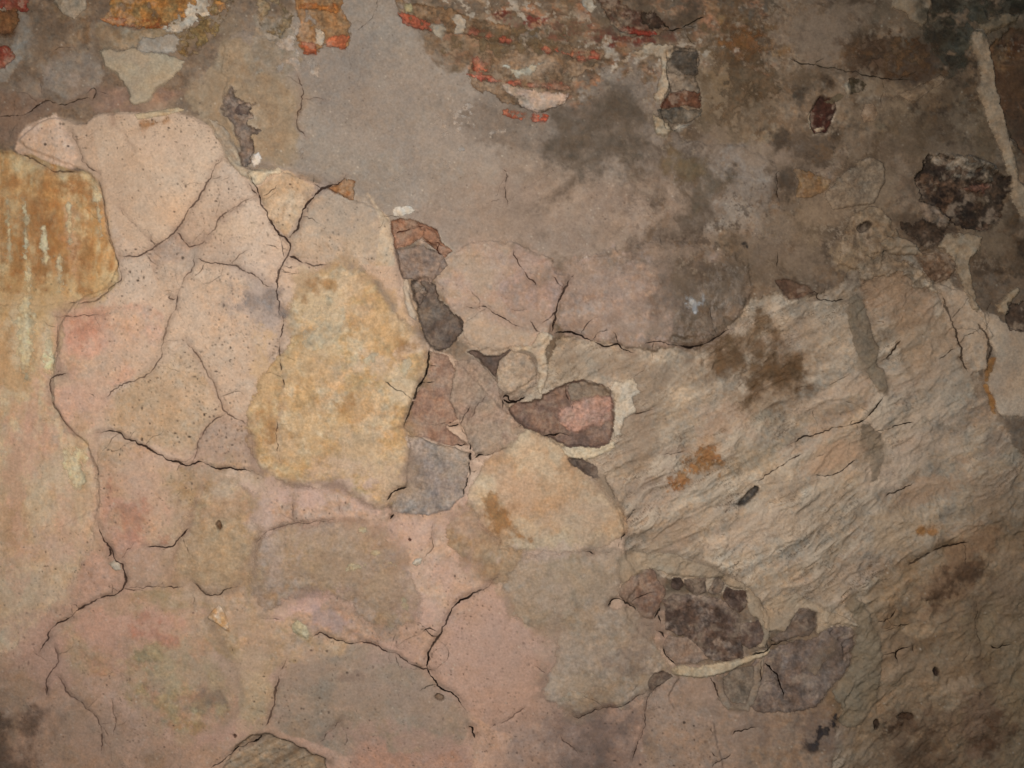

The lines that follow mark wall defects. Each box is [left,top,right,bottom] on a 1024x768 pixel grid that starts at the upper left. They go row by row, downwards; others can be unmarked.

peeling [0,0,29,69]
peeling [100,0,233,57]
peeling [256,0,351,55]
peeling [395,0,605,122]
damp [441,25,566,60]
peeling [582,0,702,136]
damp [709,27,781,124]
crack [118,178,340,384]
crack [471,254,726,352]
crack [106,430,246,471]
crack [42,529,188,693]
crack [316,589,481,703]